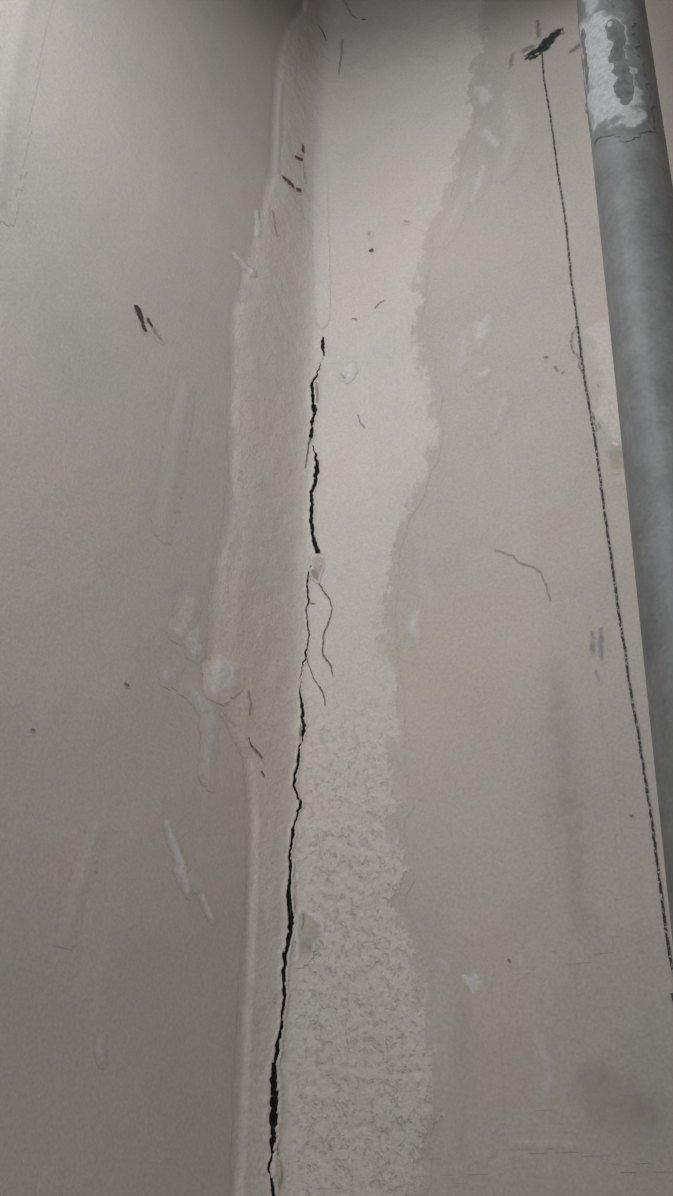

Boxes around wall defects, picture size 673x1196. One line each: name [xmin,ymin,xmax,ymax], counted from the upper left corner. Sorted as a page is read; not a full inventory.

crack [248,336,333,1196]
crack [495,549,551,601]
crack [541,51,673,1004]